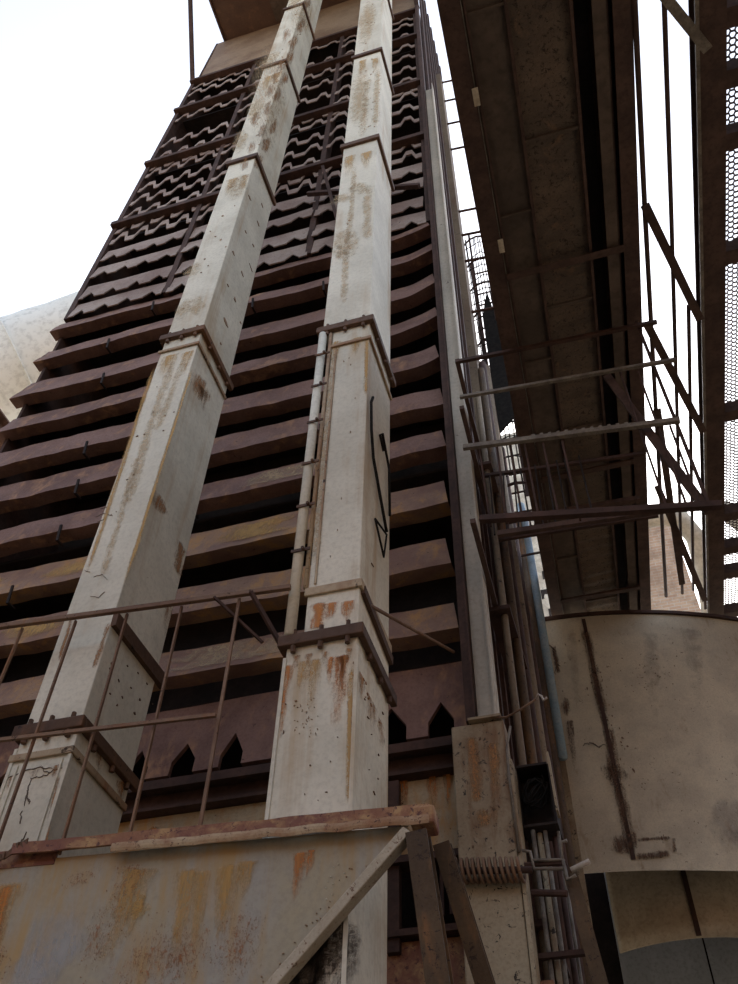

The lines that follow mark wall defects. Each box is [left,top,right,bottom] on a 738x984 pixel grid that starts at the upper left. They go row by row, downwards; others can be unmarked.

corrosion [311,600,353,628]
corrosion [281,648,383,798]
crack [2,765,58,842]